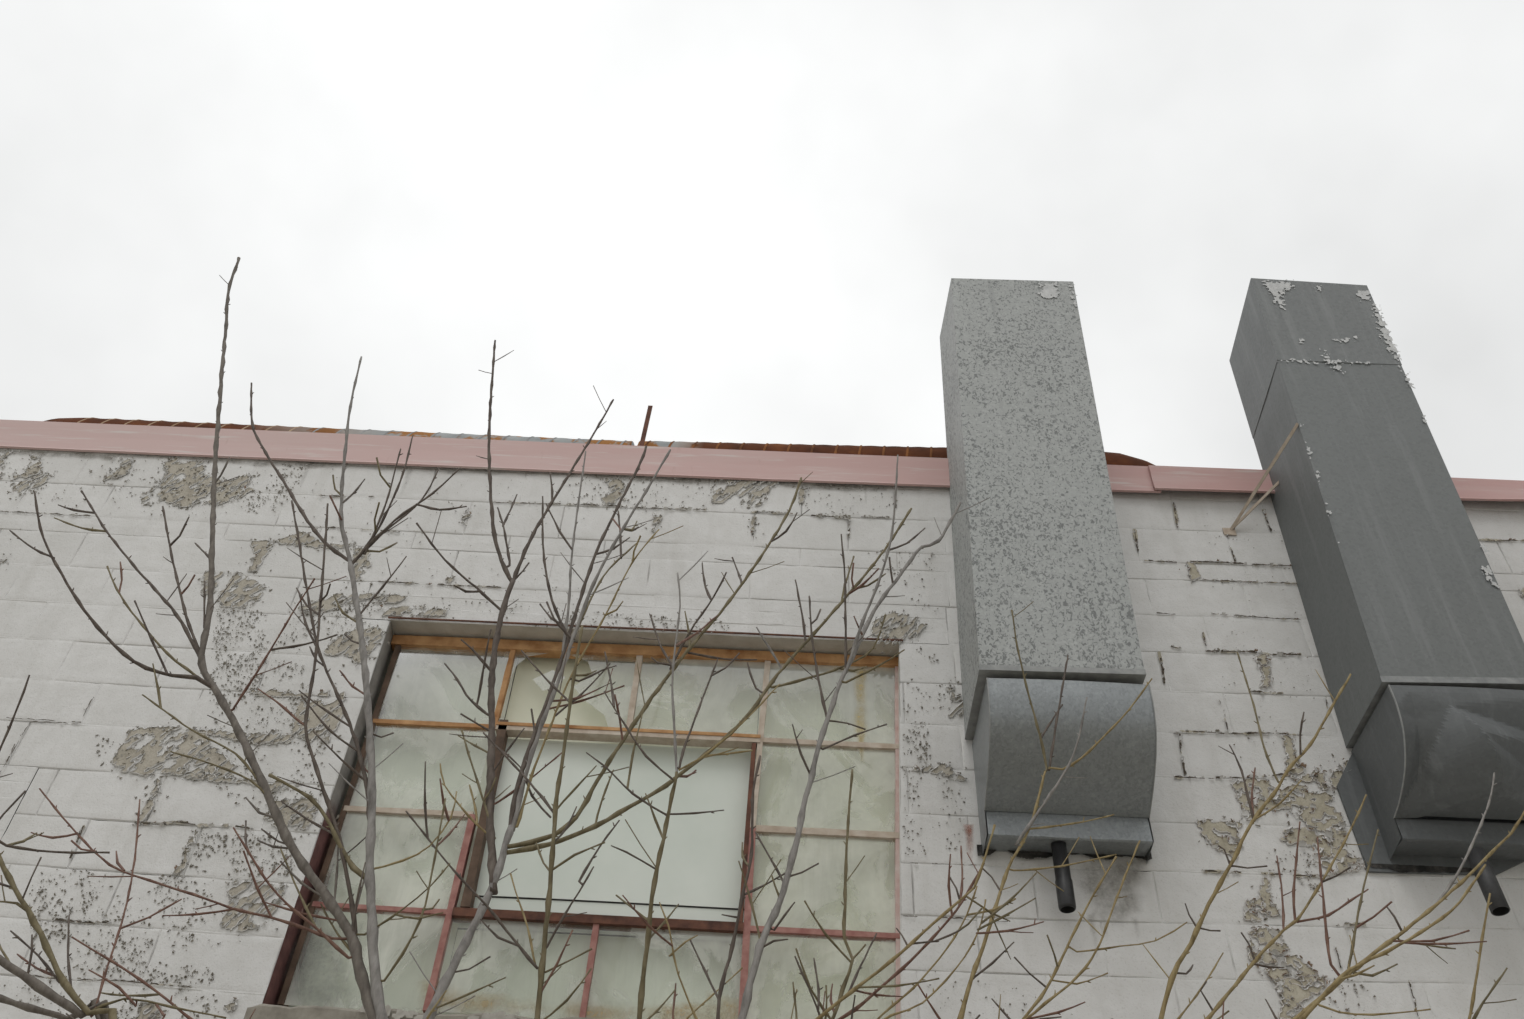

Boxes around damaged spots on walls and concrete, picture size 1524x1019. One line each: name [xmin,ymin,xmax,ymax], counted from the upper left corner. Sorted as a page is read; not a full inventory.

peeling [0,450,58,500]
peeling [89,457,261,513]
peeling [195,531,471,668]
peeling [868,609,928,654]
peeling [100,658,348,835]
peeling [1196,731,1366,875]
peeling [1239,877,1333,1019]